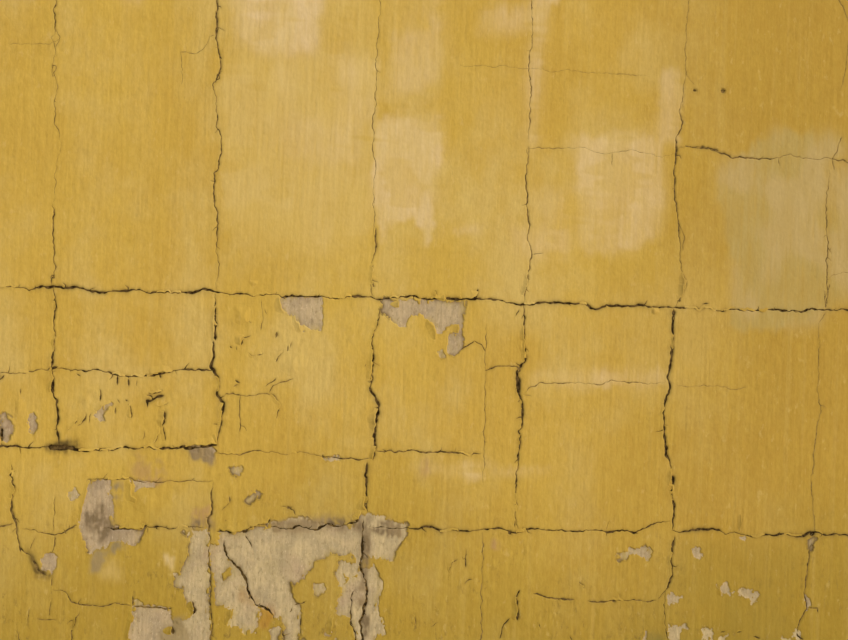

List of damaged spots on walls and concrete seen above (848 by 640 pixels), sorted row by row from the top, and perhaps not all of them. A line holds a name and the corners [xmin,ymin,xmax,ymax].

crack [38,0,61,194]
crack [181,0,223,279]
crack [368,0,381,287]
crack [516,18,533,141]
peeling [274,295,323,333]
peeling [380,297,467,358]
peeling [0,412,14,443]
crack [0,137,848,640]
peeling [123,599,171,640]
peeling [173,523,386,640]
peeling [374,522,410,561]
peeling [615,545,652,563]